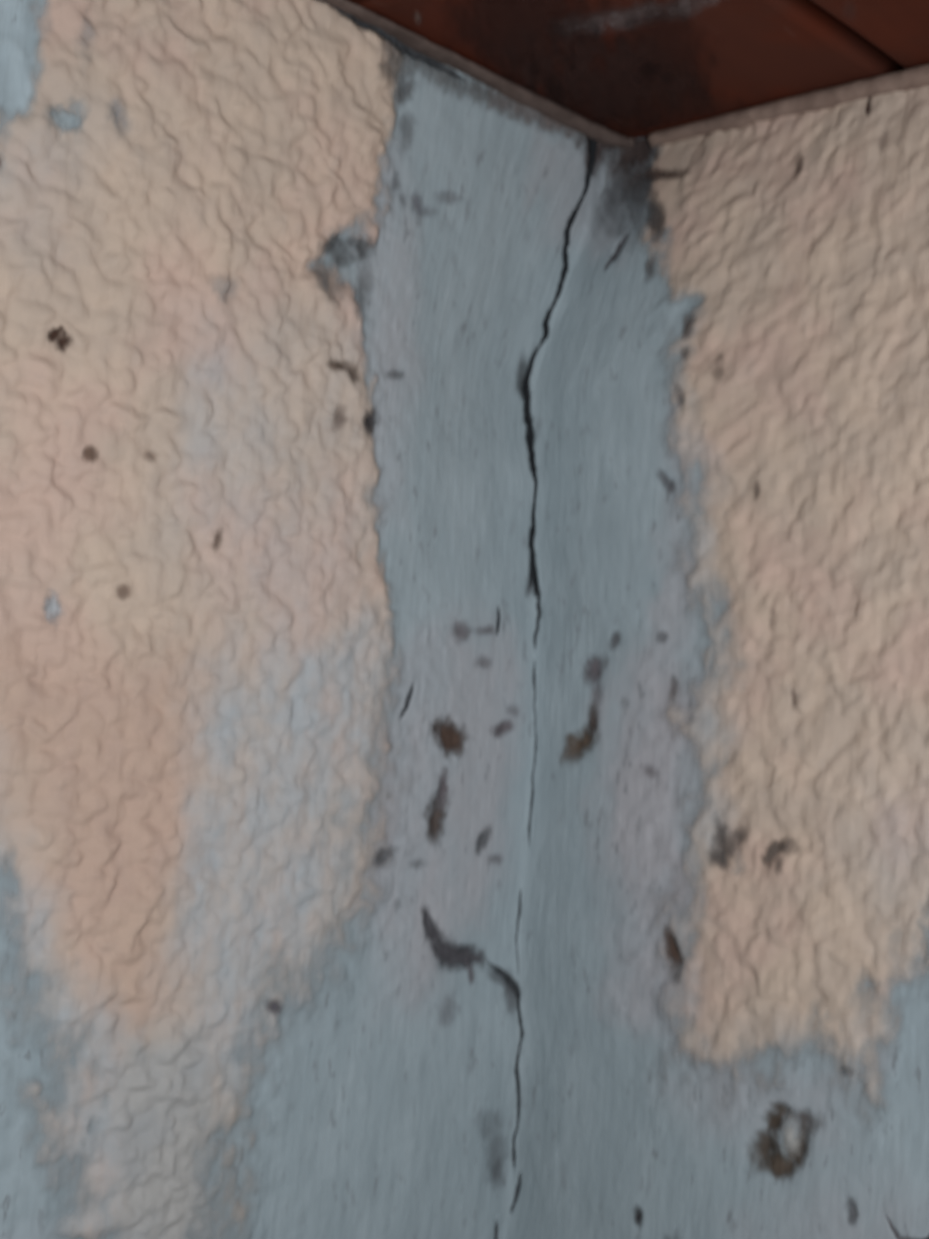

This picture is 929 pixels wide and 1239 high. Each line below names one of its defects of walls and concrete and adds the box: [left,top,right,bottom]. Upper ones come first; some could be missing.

peeling [0,0,45,127]
crack [518,137,597,843]
peeling [207,53,929,1239]
rust [564,706,597,758]
rust [586,658,601,681]
crack [488,891,523,1239]
crack [887,1217,929,1239]